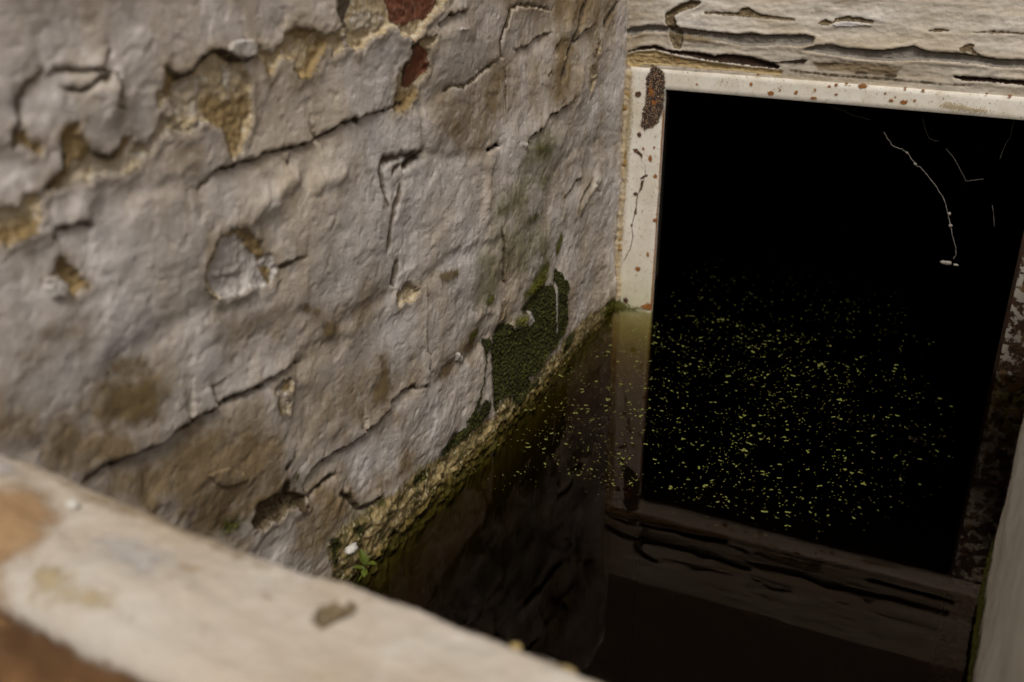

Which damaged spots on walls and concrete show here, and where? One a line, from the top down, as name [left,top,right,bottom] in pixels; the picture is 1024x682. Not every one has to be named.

flaking render [43,258,90,298]
crack [11,50,126,150]
flaking render [0,0,446,247]
flaking render [206,227,277,300]
crack [198,106,392,189]
crack [378,150,420,287]
corrosion [623,64,666,310]
spalling [327,0,1024,584]
corrosion [811,62,900,100]
crack [181,361,300,429]
crack [286,352,431,509]
flaking render [251,480,310,530]